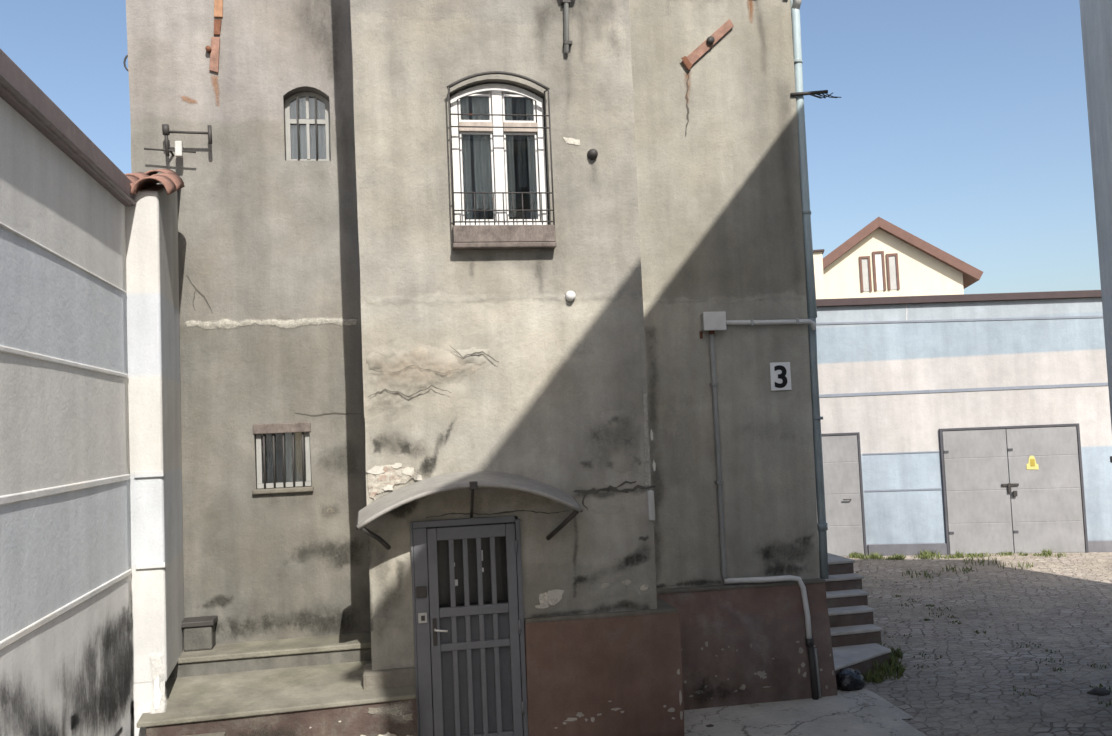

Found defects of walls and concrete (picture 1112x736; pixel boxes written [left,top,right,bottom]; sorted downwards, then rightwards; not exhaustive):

leakage [374,438,436,472]
spalling [367,463,422,500]
crack [426,481,655,518]
spalling [535,589,564,609]
leakage [64,608,134,725]
leakage [0,685,64,736]
spalling [368,707,413,720]